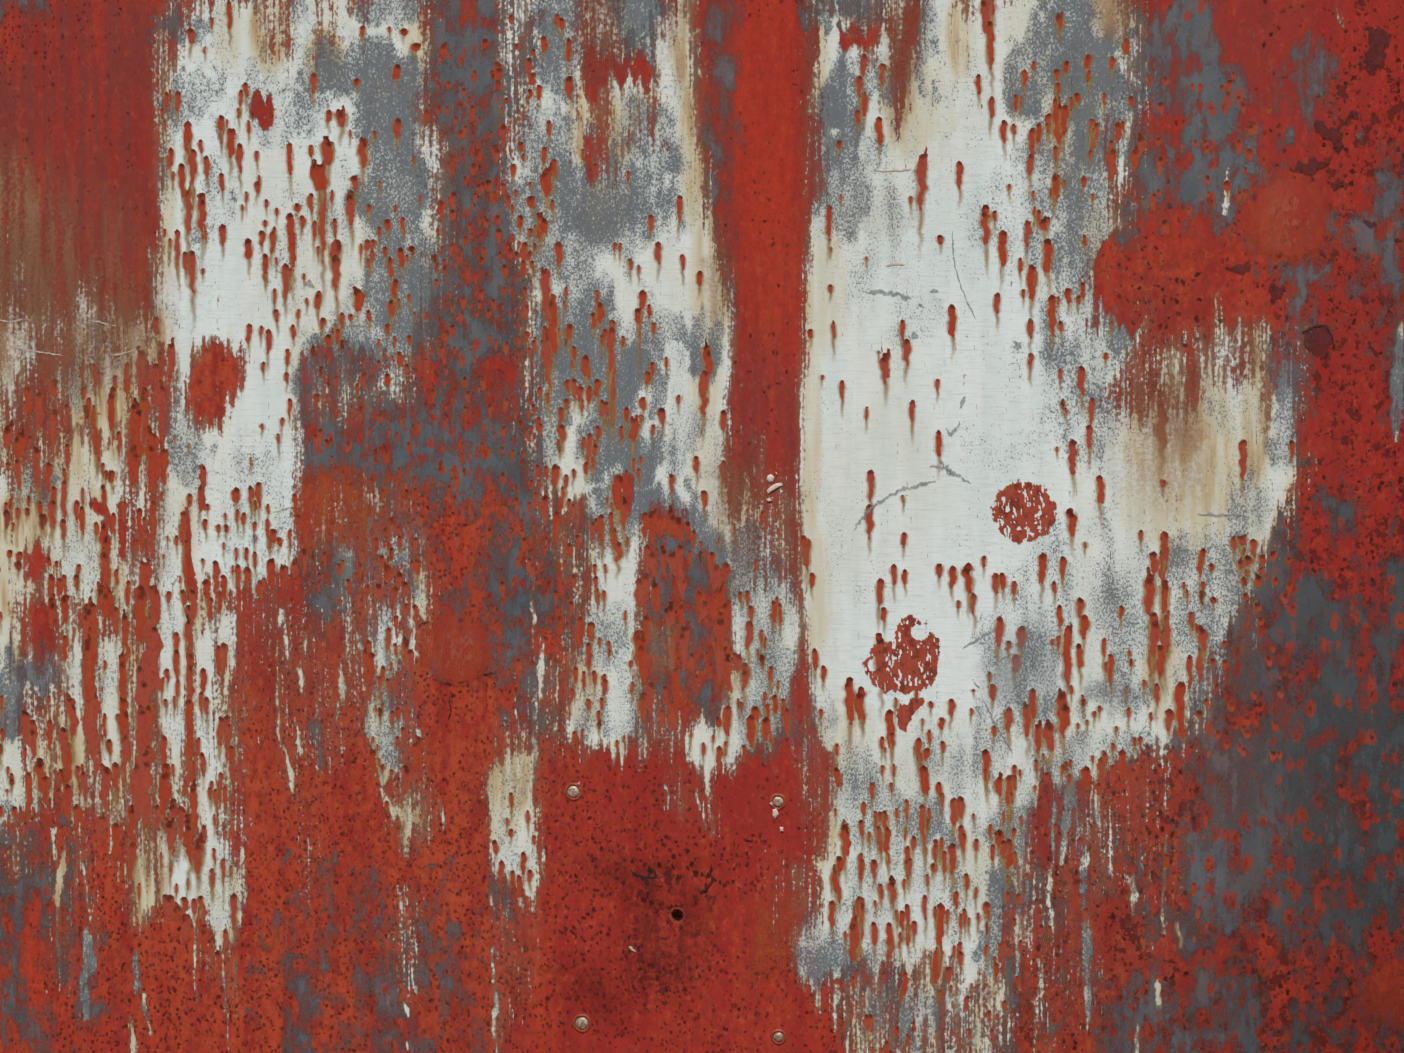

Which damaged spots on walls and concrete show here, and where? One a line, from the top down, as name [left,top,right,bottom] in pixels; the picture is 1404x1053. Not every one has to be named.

rust [0,72,448,975]
peeling [0,0,462,1053]
rust [419,38,791,774]
rust [855,53,887,154]
rust [877,319,912,393]
peeling [481,0,1333,1053]
rust [908,147,944,248]
rust [948,304,957,345]
rust [975,0,1170,380]
rust [1055,365,1106,515]
rust [492,787,537,896]
rust [828,470,1258,1053]